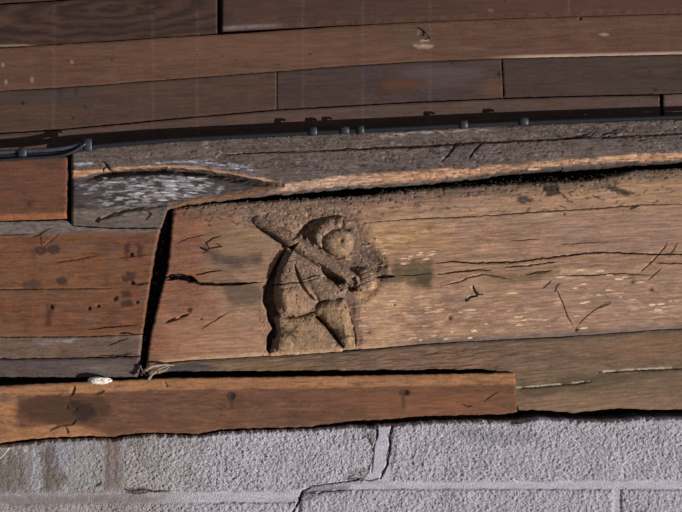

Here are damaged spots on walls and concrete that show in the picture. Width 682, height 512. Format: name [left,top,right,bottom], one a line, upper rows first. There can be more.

crack [358,204,681,226]
crack [165,270,320,286]
crack [376,241,682,329]